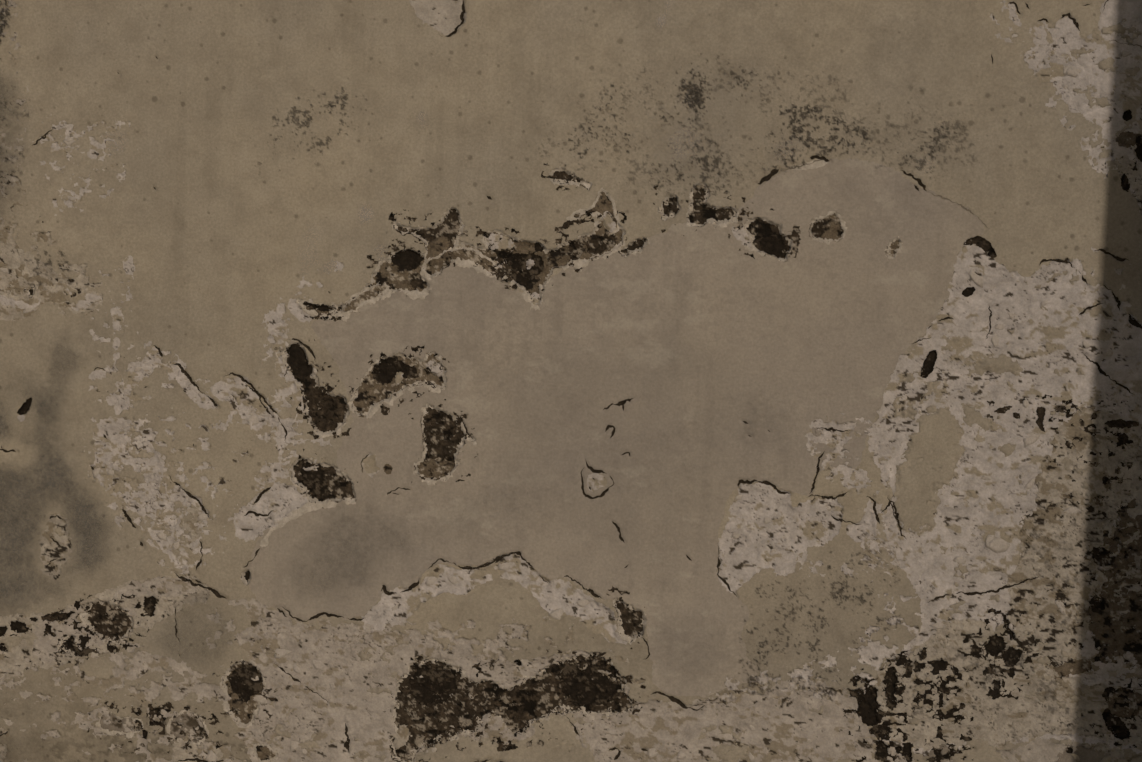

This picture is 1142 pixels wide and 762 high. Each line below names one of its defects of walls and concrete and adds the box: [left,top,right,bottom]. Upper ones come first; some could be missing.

peeling [408,0,467,37]
peeling [0,85,131,216]
peeling [989,0,1142,215]
damp [0,446,100,598]
flaking render [0,155,1142,762]